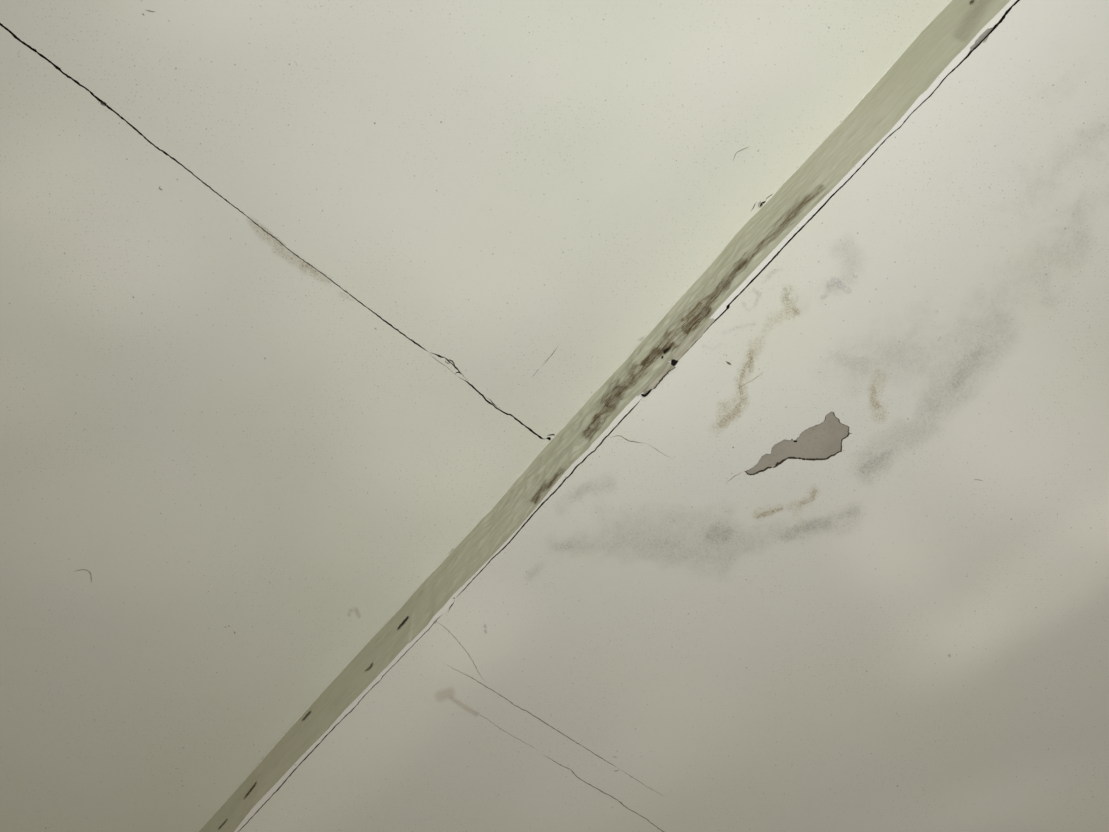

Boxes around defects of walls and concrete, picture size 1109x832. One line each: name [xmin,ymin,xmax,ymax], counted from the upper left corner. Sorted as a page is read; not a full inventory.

crack [0,23,555,440]
damp [725,186,822,283]
damp [681,297,717,335]
damp [584,331,675,433]
peeling [729,412,852,481]
crack [238,397,666,832]